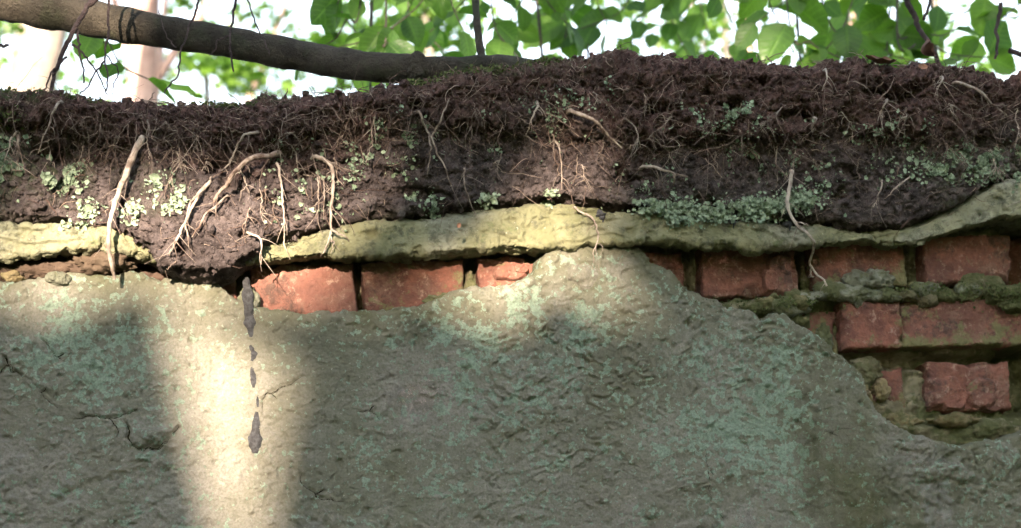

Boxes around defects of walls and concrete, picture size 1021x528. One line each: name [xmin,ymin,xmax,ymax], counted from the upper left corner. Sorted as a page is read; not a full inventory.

peeling [945,225,1021,240]
peeling [0,250,172,286]
peeling [236,270,261,307]
peeling [353,261,376,311]
peeling [443,252,545,289]
peeling [632,245,697,292]
water stain [241,277,263,453]
peeling [720,245,1021,445]